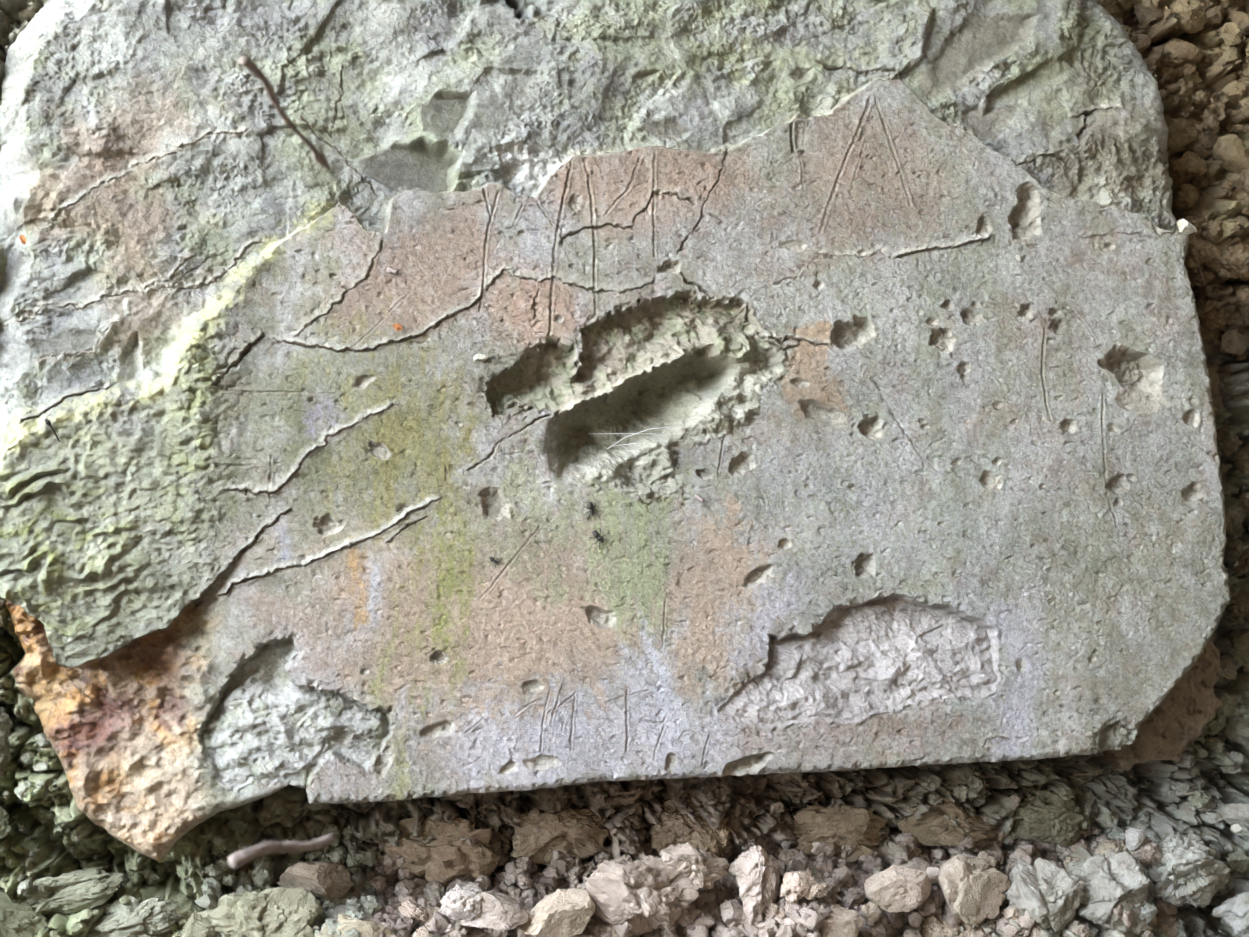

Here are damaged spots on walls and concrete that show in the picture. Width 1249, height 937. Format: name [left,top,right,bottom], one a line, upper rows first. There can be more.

crack [0,56,1189,429]
crack [182,394,568,609]
spalling [554,346,731,472]
spalling [692,449,759,482]
spalling [195,634,398,796]
spalling [714,592,1028,730]